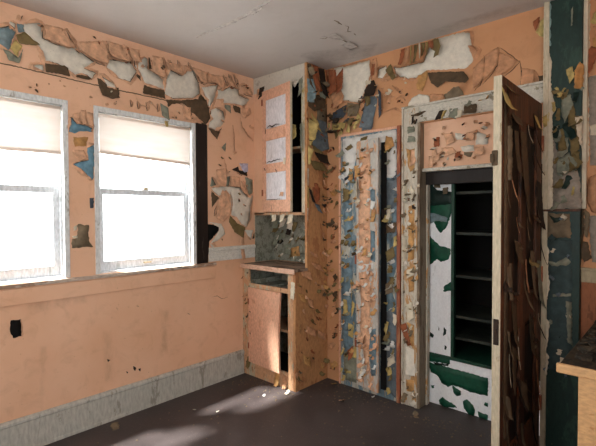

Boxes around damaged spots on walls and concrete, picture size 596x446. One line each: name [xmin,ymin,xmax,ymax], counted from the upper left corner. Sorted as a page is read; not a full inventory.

peeling [0,15,255,141]
peeling [67,110,94,181]
peeling [71,224,93,248]
peeling [210,129,254,260]
peeling [306,31,490,293]
peeling [502,0,596,446]
peeling [399,301,419,406]
peeling [429,355,488,420]